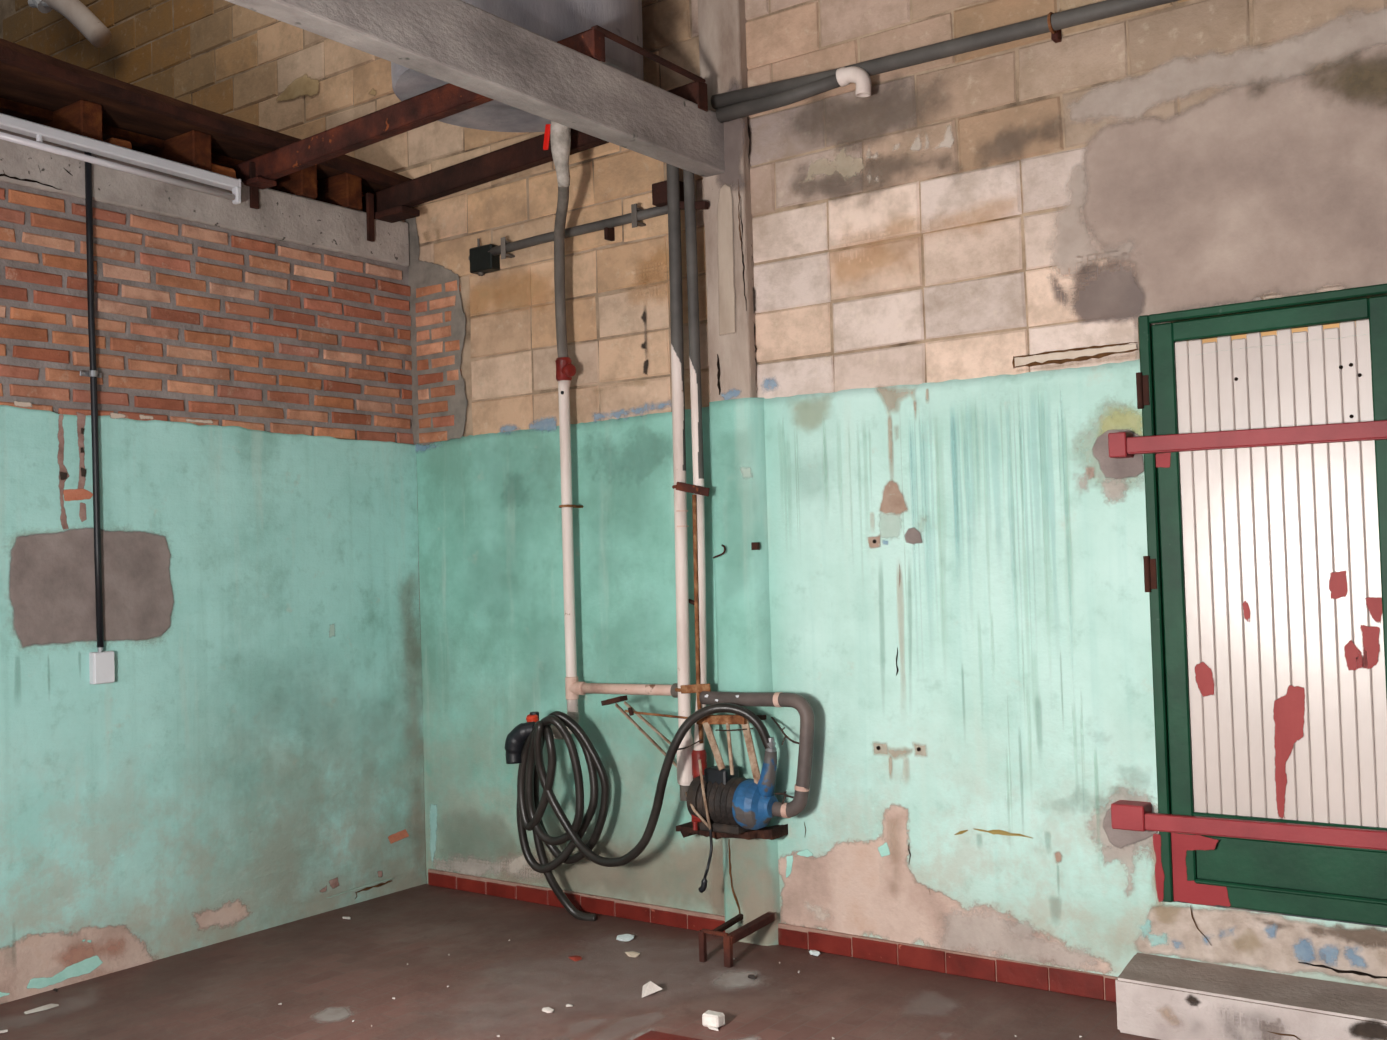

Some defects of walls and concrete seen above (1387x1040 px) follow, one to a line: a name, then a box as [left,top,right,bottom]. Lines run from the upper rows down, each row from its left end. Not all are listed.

crack [0,165,73,190]
water stain [794,90,953,196]
flaking render [63,489,93,501]
peeling [0,925,156,1004]
peeling [194,899,249,929]
peeling [778,805,1112,974]
peeling [1102,844,1135,896]
peeling [1135,905,1387,986]